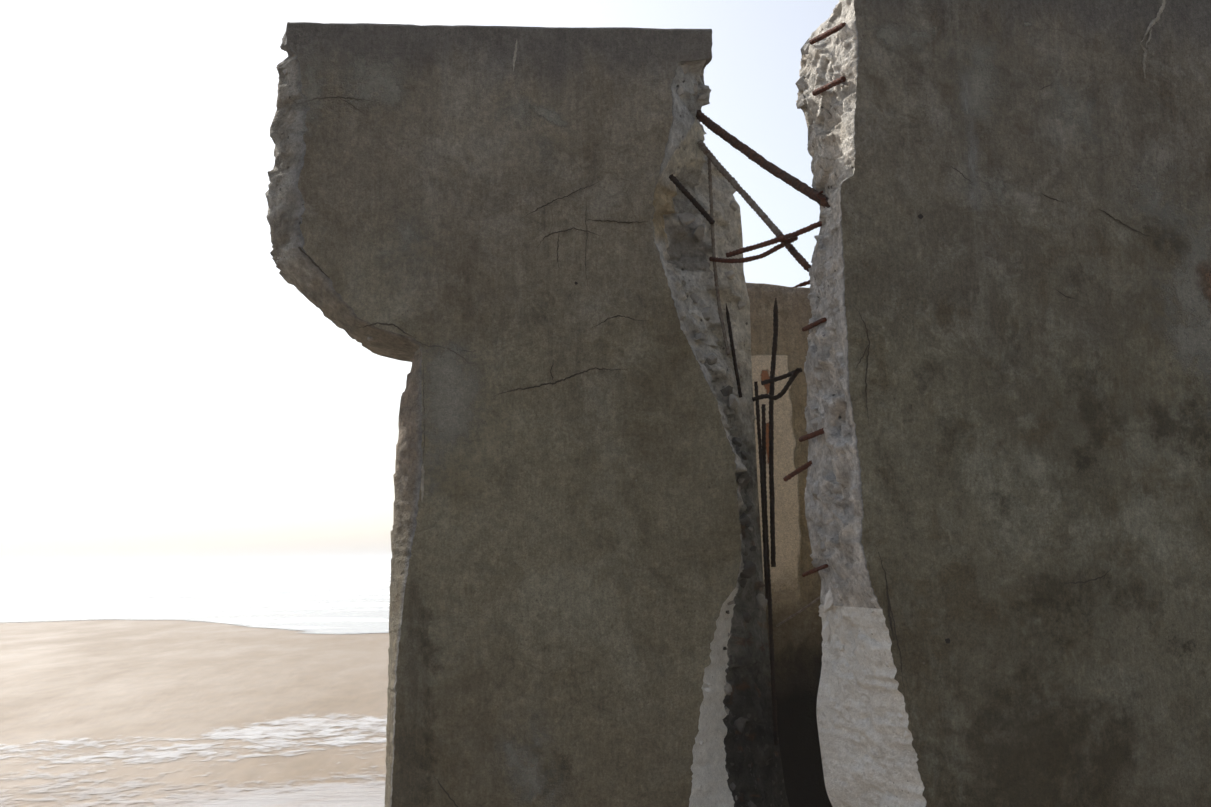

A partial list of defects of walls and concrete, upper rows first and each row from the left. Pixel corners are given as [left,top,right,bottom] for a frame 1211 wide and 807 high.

crack [1140,0,1166,78]
crack [521,182,648,285]
spalling [265,22,423,807]
crack [497,361,626,395]
spalling [652,0,927,807]